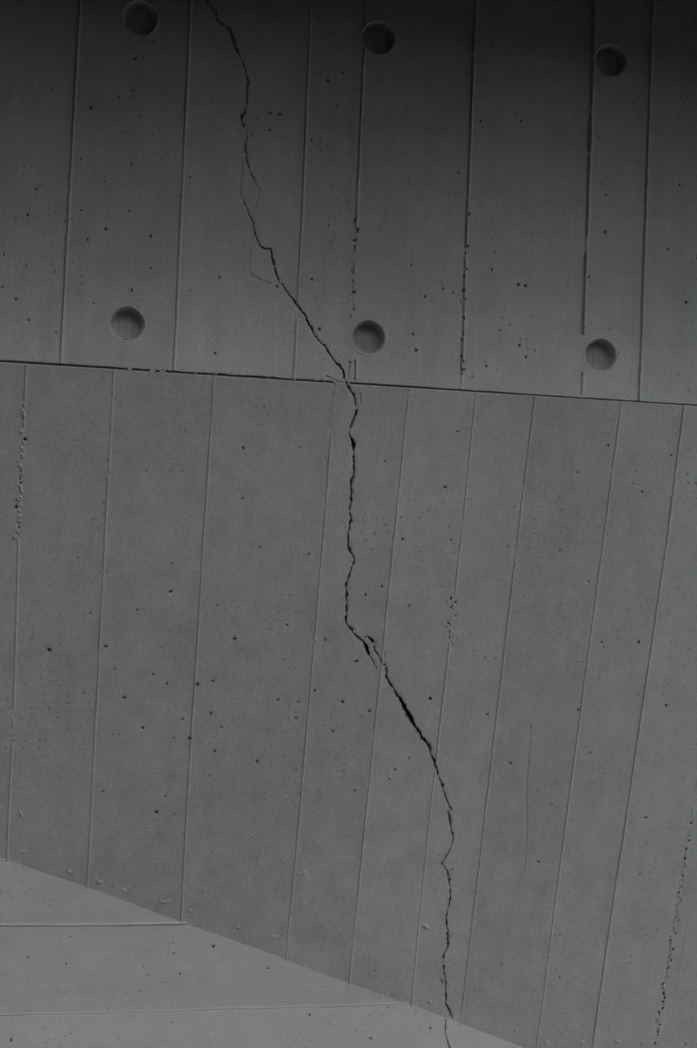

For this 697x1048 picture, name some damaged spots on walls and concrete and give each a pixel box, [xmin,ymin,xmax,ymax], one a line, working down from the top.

crack [205,0,455,1048]